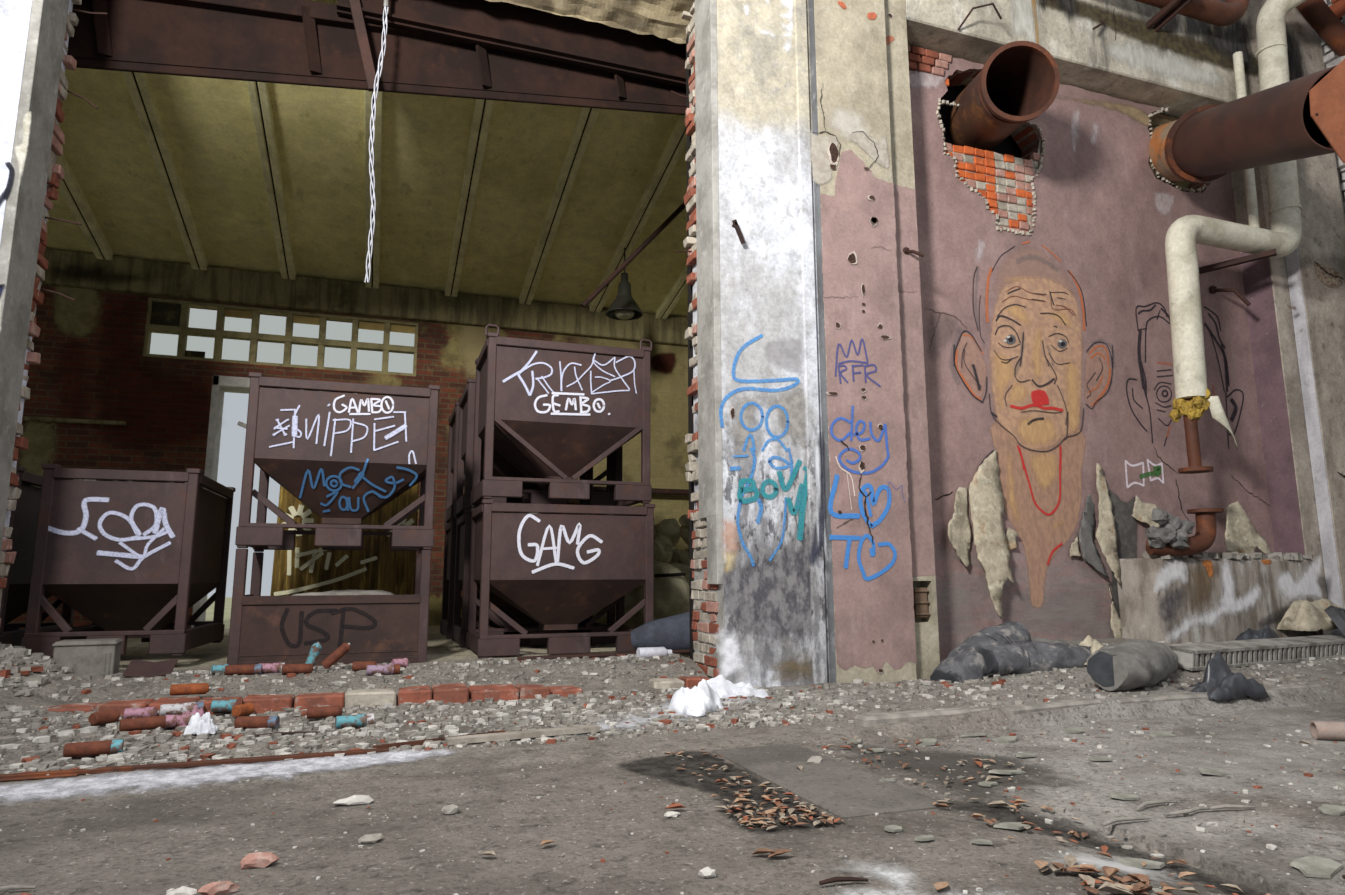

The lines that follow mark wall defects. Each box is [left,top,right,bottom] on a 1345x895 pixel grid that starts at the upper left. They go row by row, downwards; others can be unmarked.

leakage [1011,0,1078,42]
leakage [1110,42,1219,83]
leakage [1208,23,1256,72]
leakage [1286,29,1304,81]
flaking render [14,112,31,186]
flaking render [886,36,1046,236]
peeling [948,449,1018,618]
peeling [1070,463,1313,638]
efflorescence [720,631,744,678]